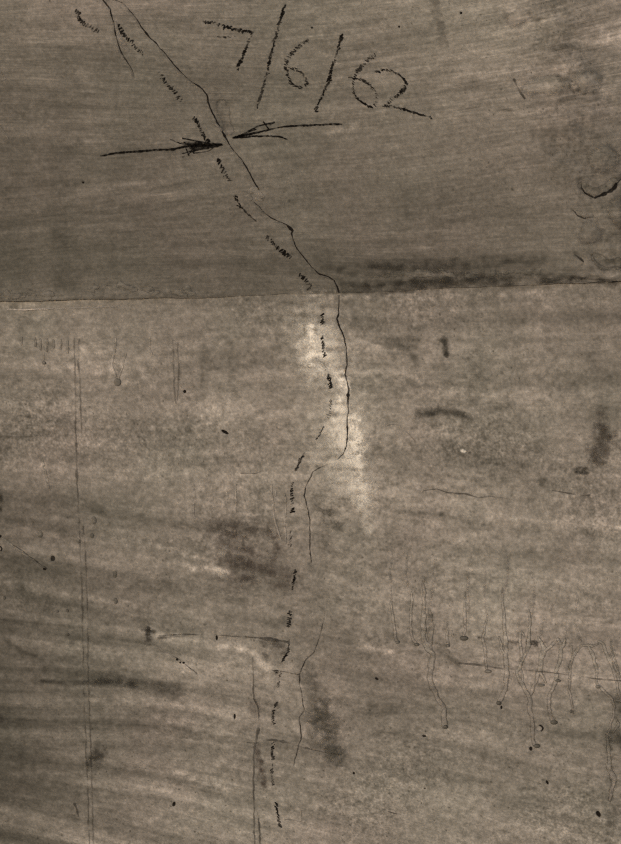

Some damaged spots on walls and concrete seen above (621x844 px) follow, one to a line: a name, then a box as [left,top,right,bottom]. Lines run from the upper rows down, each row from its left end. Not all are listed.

crack [103,0,350,458]
water stain [298,324,368,506]
crack [304,467,321,563]
water stain [405,550,448,729]
water stain [496,550,621,802]